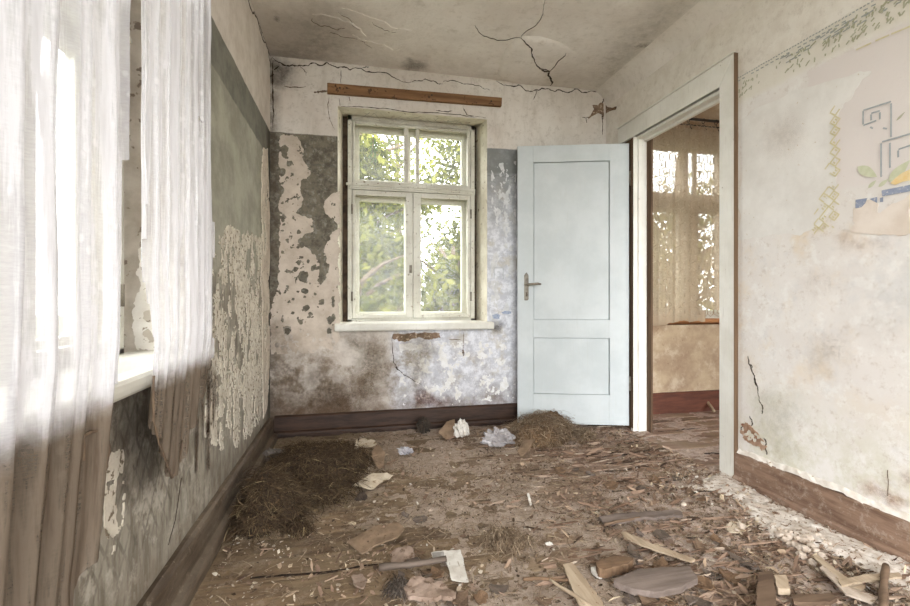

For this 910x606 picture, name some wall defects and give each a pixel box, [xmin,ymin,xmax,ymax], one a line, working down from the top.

crack [248,0,604,134]
flaking render [588,103,617,119]
peeling [738,71,871,240]
peeling [204,134,341,451]
peeling [491,161,516,330]
peeling [850,194,910,236]
peeling [392,332,515,405]
flaking render [740,422,767,451]
crack [741,358,768,455]
peeling [103,449,126,555]